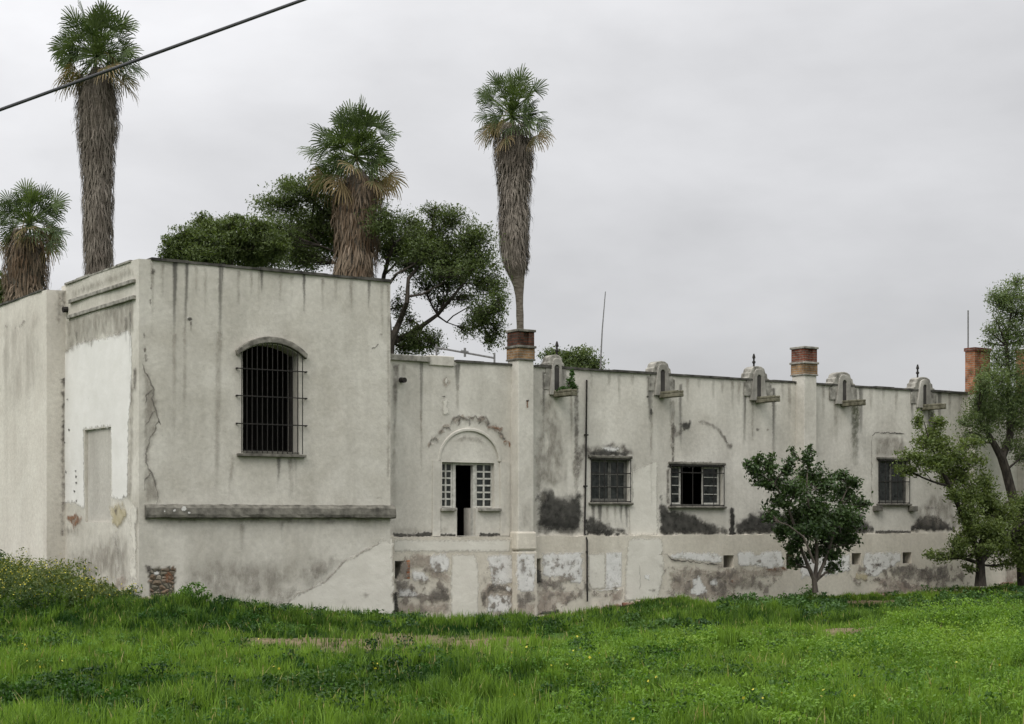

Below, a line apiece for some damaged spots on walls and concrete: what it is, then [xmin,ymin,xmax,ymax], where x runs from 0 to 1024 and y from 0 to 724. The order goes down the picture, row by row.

damp [173,262,188,290]
crack [142,363,161,425]
flaking render [428,378,510,447]
damp [660,420,792,535]
damp [539,490,625,536]
flaking render [110,496,176,597]
flaking render [393,554,449,614]
flaking render [665,551,785,599]
peeling [801,552,968,593]
flaking render [1006,564,1017,583]